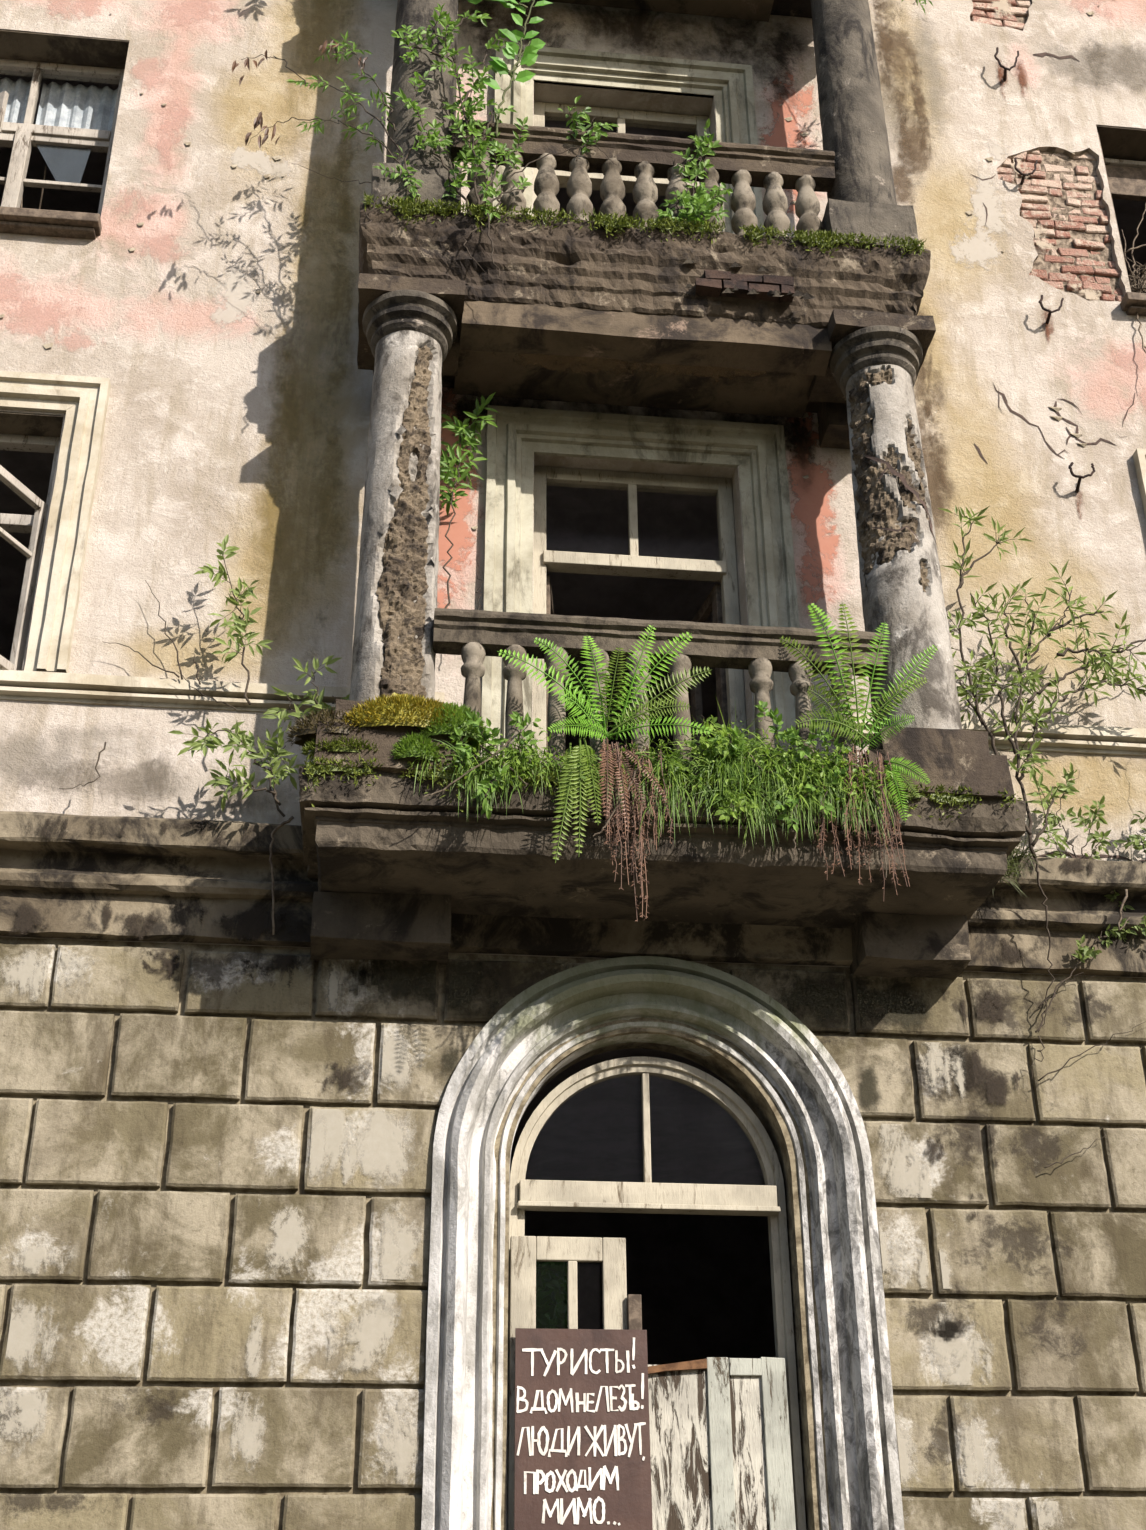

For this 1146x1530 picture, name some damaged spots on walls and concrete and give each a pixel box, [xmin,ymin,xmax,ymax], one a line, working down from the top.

spalling [970,0,1032,31]
spalling [950,139,1124,302]
spalling [376,345,481,698]
peeling [787,412,840,613]
spalling [848,369,930,592]
crack [993,383,1135,458]
water stain [309,1108,415,1183]
water stain [860,1068,944,1198]
water stain [919,1042,1020,1106]
water stain [5,1299,59,1370]
water stain [329,1207,423,1370]
water stain [879,1224,992,1385]